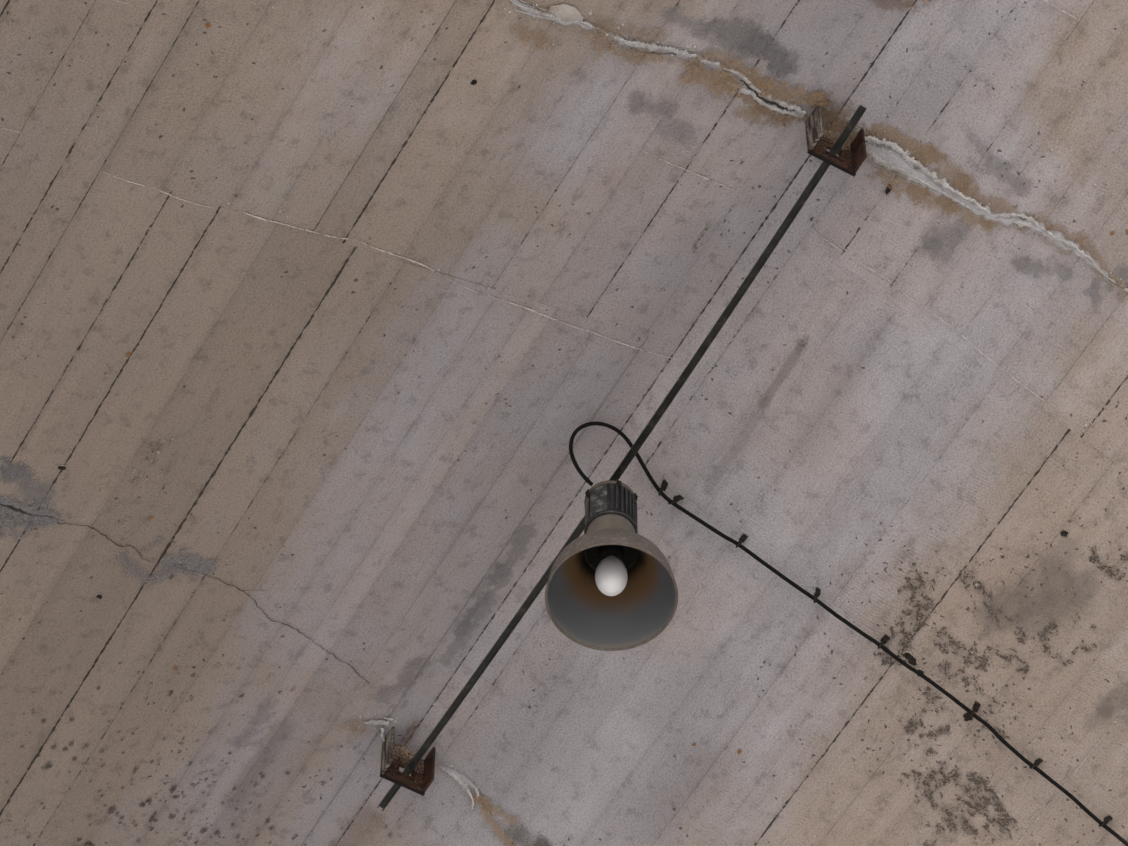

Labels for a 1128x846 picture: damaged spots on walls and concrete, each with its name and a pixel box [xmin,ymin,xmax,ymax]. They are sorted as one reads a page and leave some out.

crack [504,0,807,119]
leakage [709,20,799,79]
leakage [0,458,69,526]
crack [0,504,154,562]
crack [188,570,370,685]
leakage [439,765,486,809]